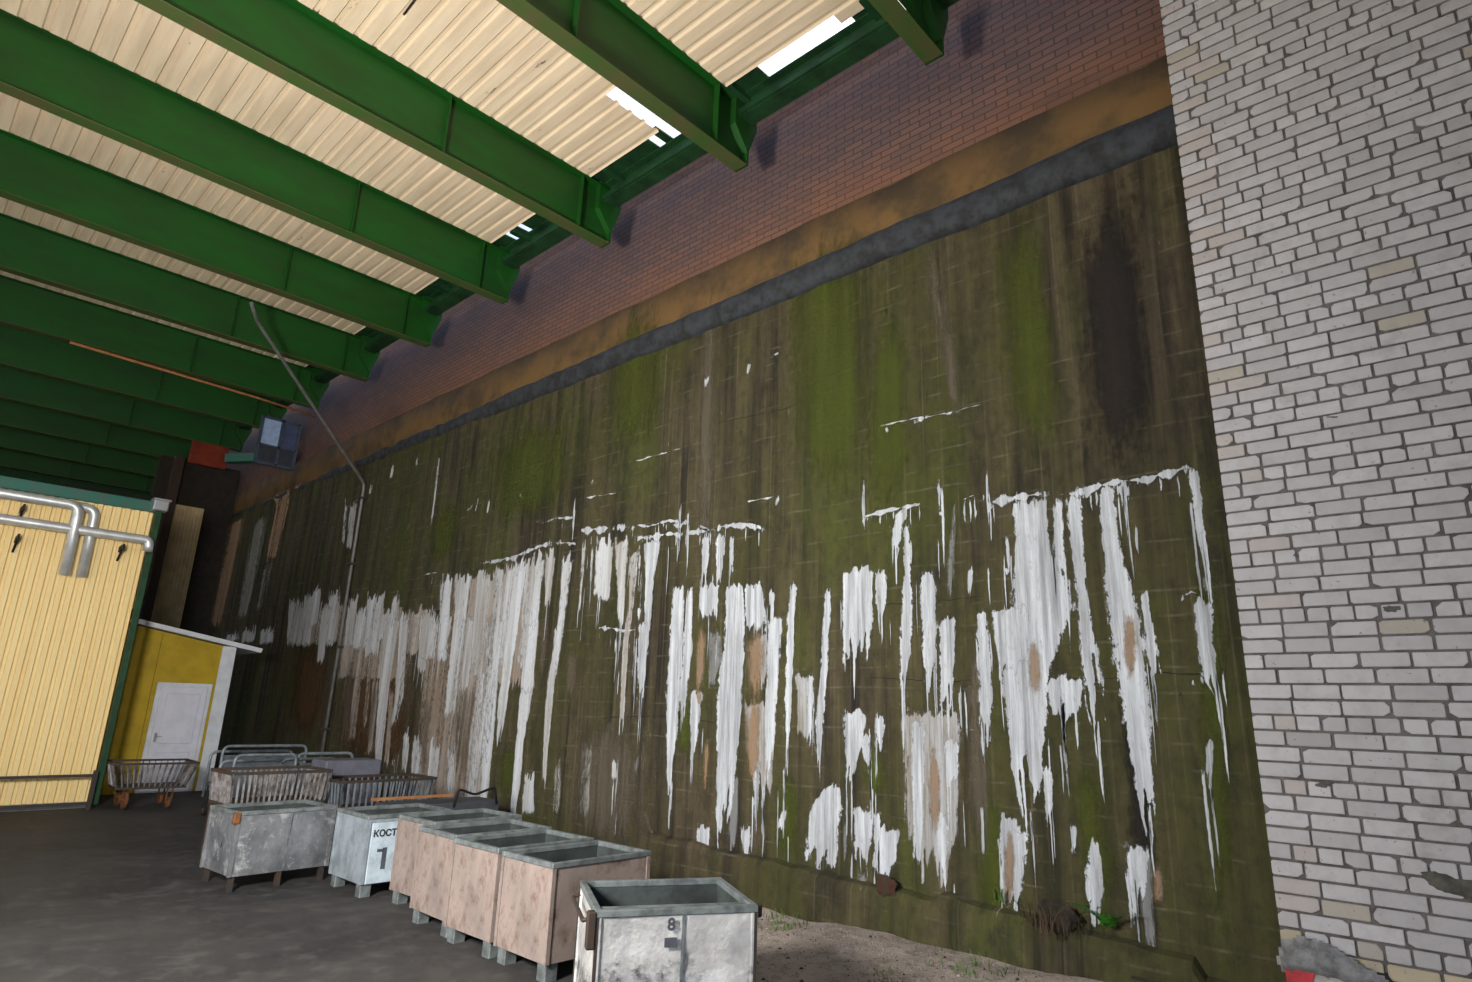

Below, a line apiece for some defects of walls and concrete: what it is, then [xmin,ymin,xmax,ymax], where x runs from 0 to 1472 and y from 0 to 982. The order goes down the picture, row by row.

leakage [226,207,1229,947]
spalling [876,873,897,898]